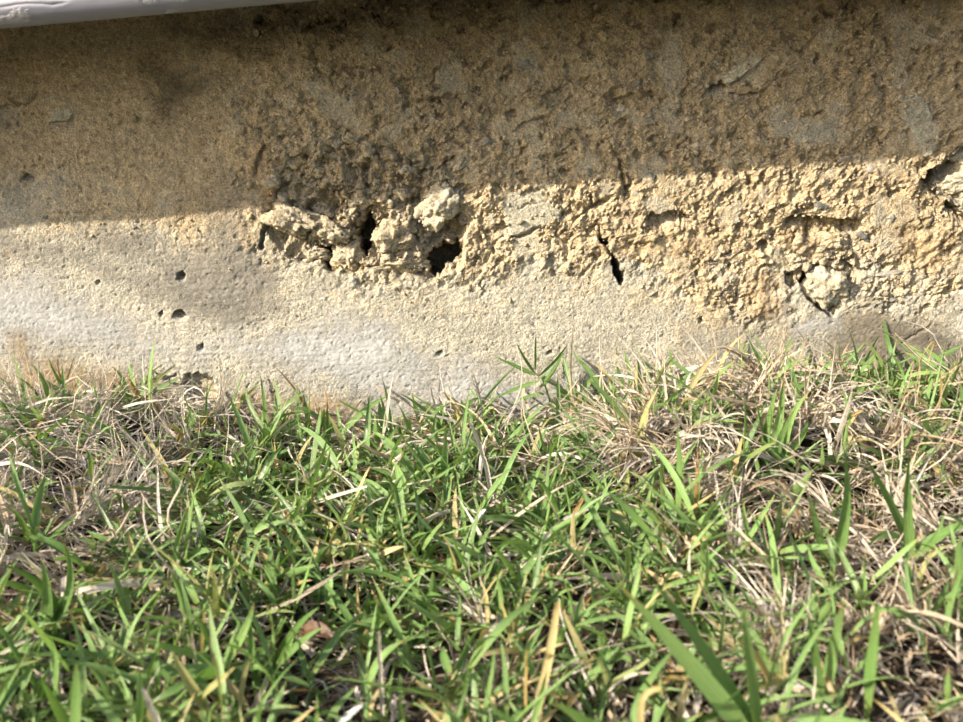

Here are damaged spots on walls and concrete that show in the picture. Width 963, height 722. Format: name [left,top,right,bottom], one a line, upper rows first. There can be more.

spalling [250,109,488,285]
crack [572,145,630,258]
spalling [898,91,963,222]
damp [0,277,171,361]
damp [140,255,263,321]
damp [195,318,595,416]